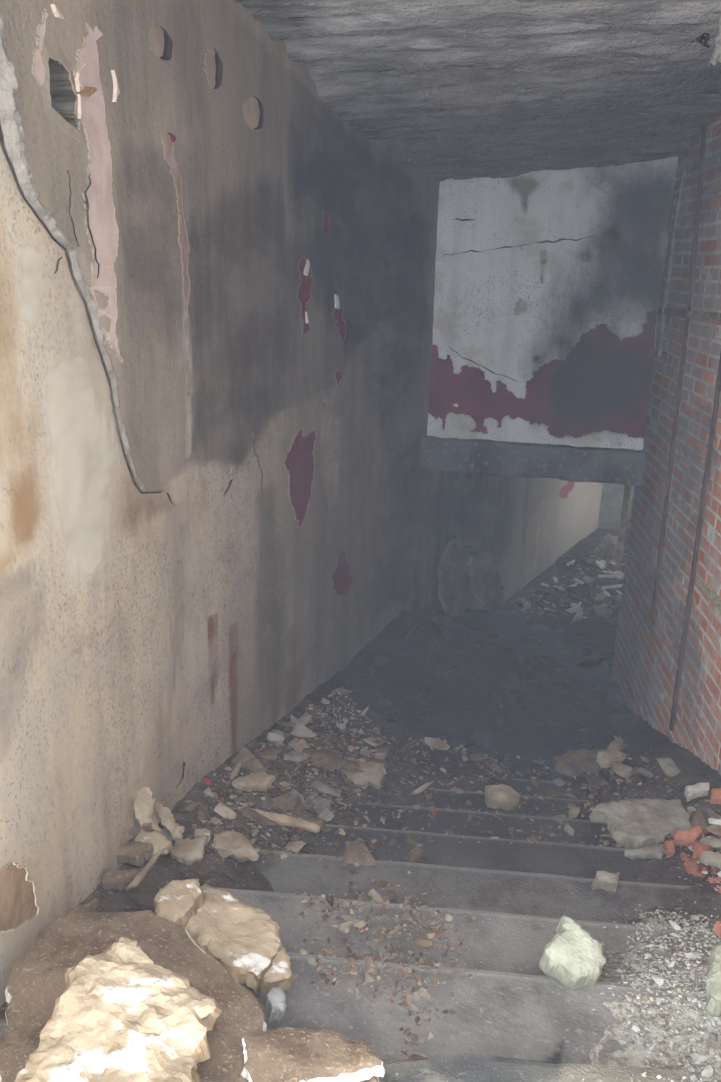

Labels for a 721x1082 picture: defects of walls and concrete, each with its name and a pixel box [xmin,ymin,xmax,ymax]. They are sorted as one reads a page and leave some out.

spalling [708,18,721,66]
peeling [31,0,124,363]
crack [0,17,176,506]
peeling [296,257,314,335]
crack [440,236,598,258]
peeling [428,309,658,440]
peeling [283,428,318,528]
spalling [0,860,39,934]